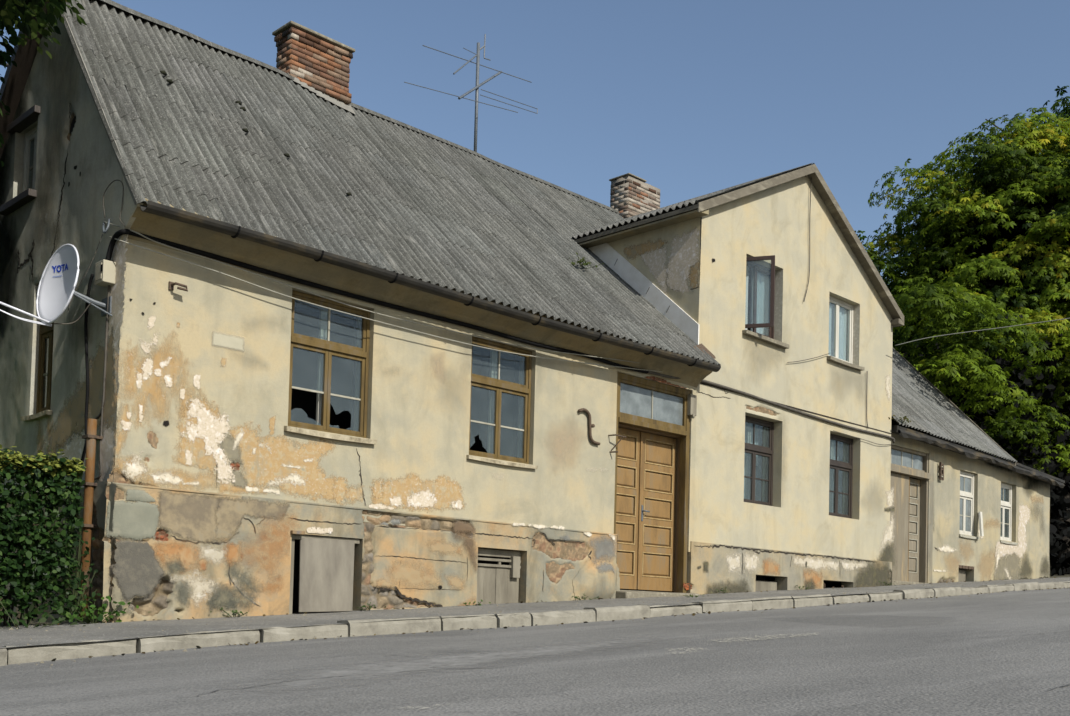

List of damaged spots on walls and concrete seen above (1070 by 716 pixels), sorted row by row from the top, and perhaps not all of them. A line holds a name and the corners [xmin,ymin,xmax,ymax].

crack [17,151,68,282]
peeling [641,227,715,293]
flaking render [47,229,199,502]
spalling [80,503,121,623]
crack [171,518,263,606]
peeling [128,302,313,616]
peeling [307,526,333,534]
crack [291,448,447,531]
spalling [361,487,473,610]
spalling [513,522,592,583]
peeling [794,557,868,571]
peeling [995,505,1031,579]